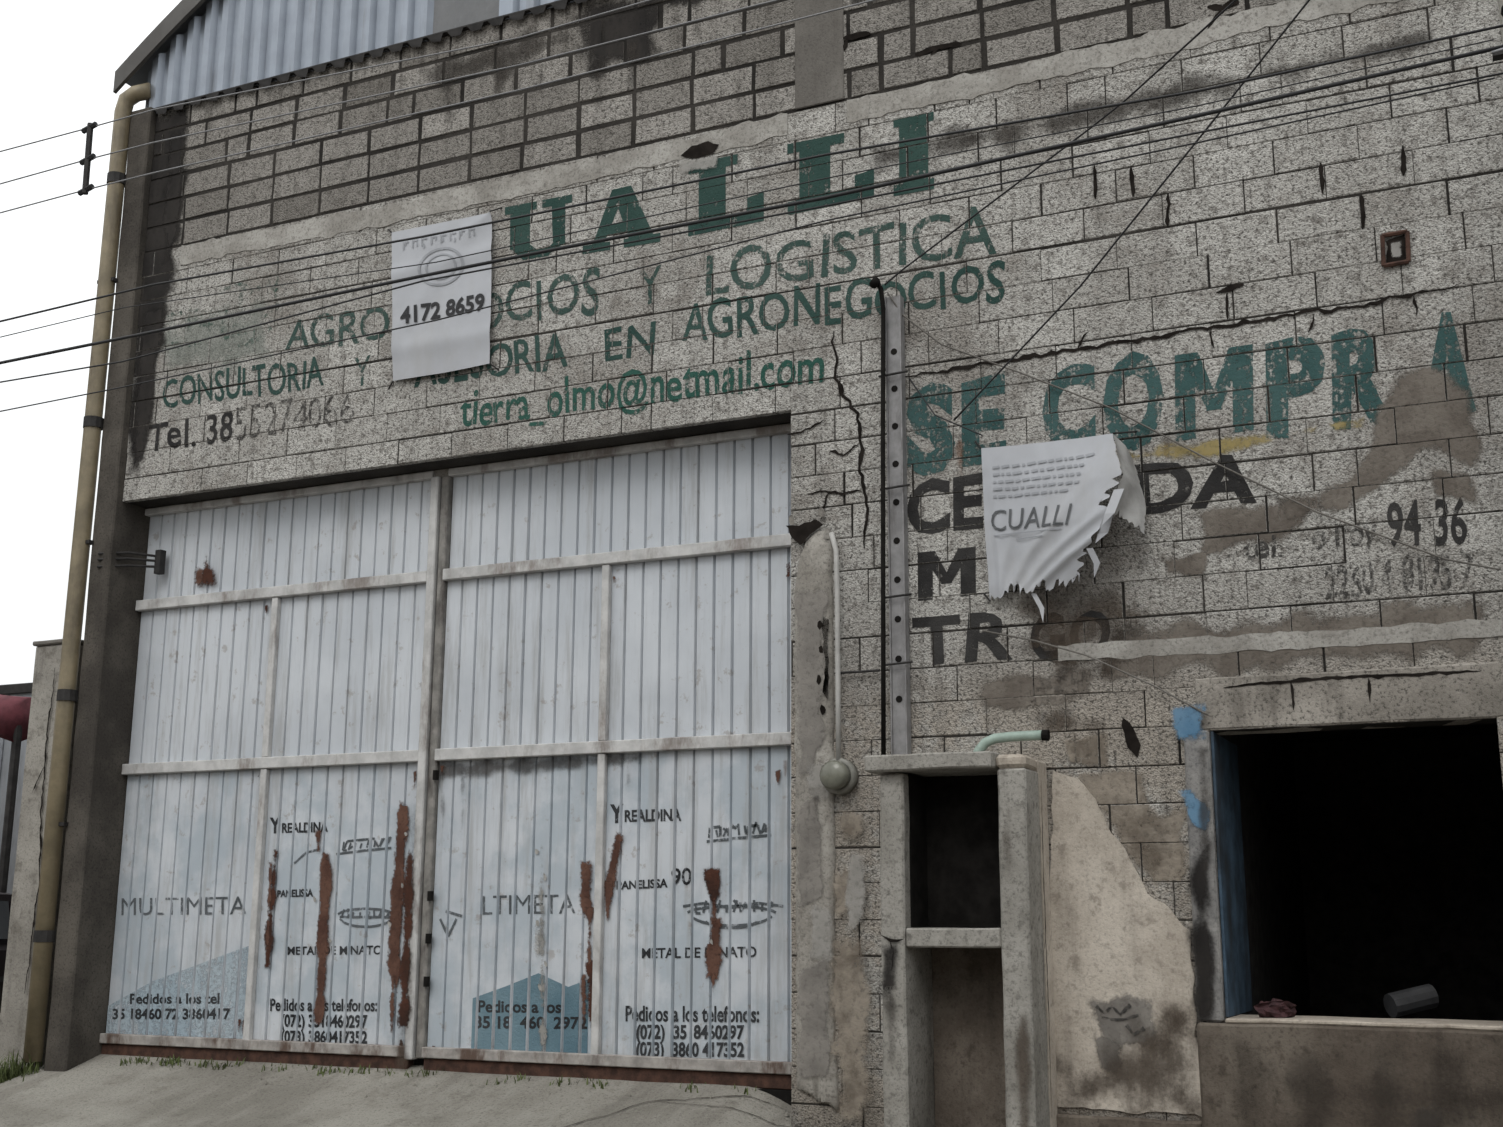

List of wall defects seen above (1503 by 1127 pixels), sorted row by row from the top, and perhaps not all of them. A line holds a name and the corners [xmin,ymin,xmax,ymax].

crack [787,331,869,548]
corrosion [313,830,333,1024]
corrosion [386,802,409,1046]
corrosion [579,832,624,1026]
corrosion [704,868,722,988]